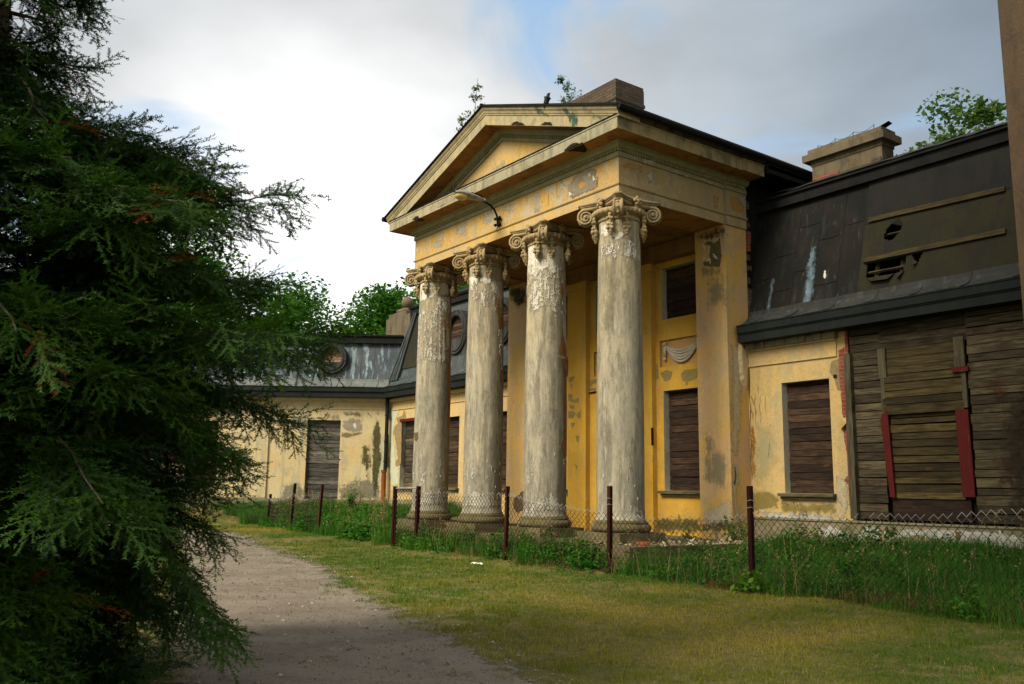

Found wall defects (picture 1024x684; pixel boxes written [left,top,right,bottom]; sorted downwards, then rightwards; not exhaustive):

flaking render [561,168,598,199]
peeling [599,222,640,260]
flaking render [702,238,722,267]
damp [804,250,826,302]
peeling [416,283,451,433]
peeling [469,276,504,388]
peeling [527,245,581,472]
flaking render [341,412,362,437]
damp [339,407,391,500]